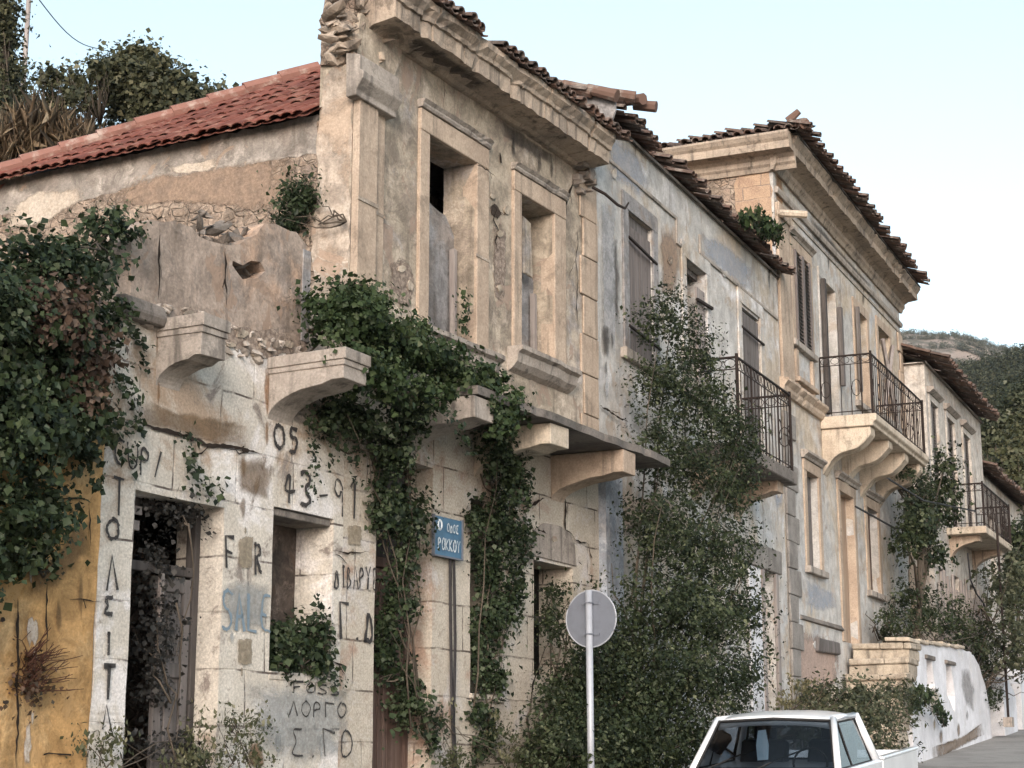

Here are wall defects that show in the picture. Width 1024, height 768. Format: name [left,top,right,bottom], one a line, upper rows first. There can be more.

peeling [120,159,287,208]
crack [156,236,164,299]
crack [220,252,228,305]
peeling [490,192,511,300]
spalling [225,326,299,359]
crack [142,424,259,455]
crack [13,602,21,768]